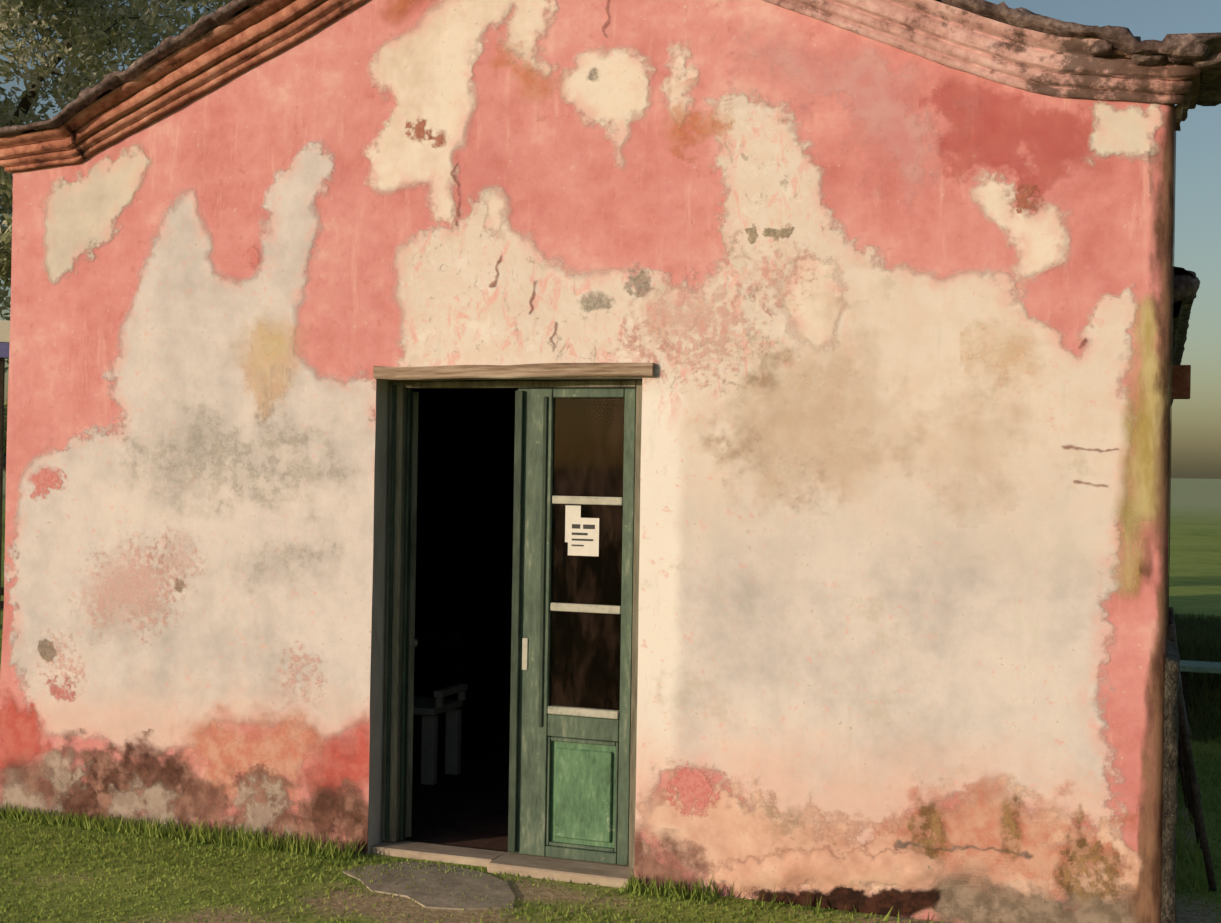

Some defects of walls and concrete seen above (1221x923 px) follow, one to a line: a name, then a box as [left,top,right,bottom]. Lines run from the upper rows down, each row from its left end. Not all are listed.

leakage [0,729,368,854]
peeling [0,142,376,829]
leakage [634,831,706,893]
peeling [365,0,1142,917]
leakage [908,806,945,859]
leakage [934,106,1177,923]